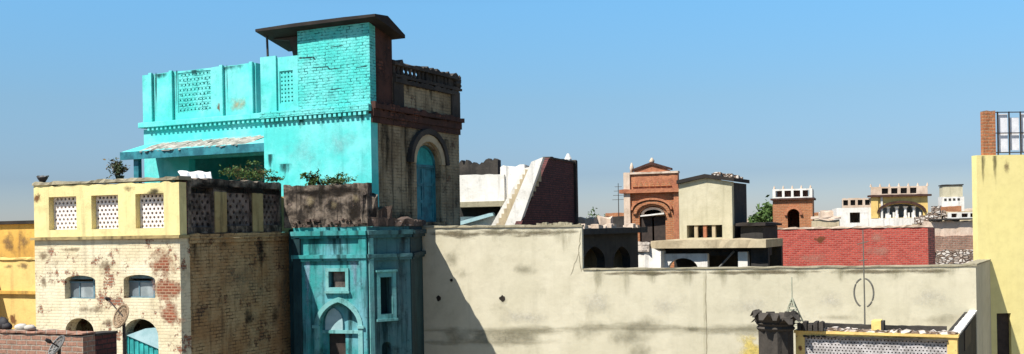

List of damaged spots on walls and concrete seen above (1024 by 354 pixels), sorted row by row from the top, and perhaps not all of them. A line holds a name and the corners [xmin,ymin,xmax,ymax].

flaking render [150,249,181,324]